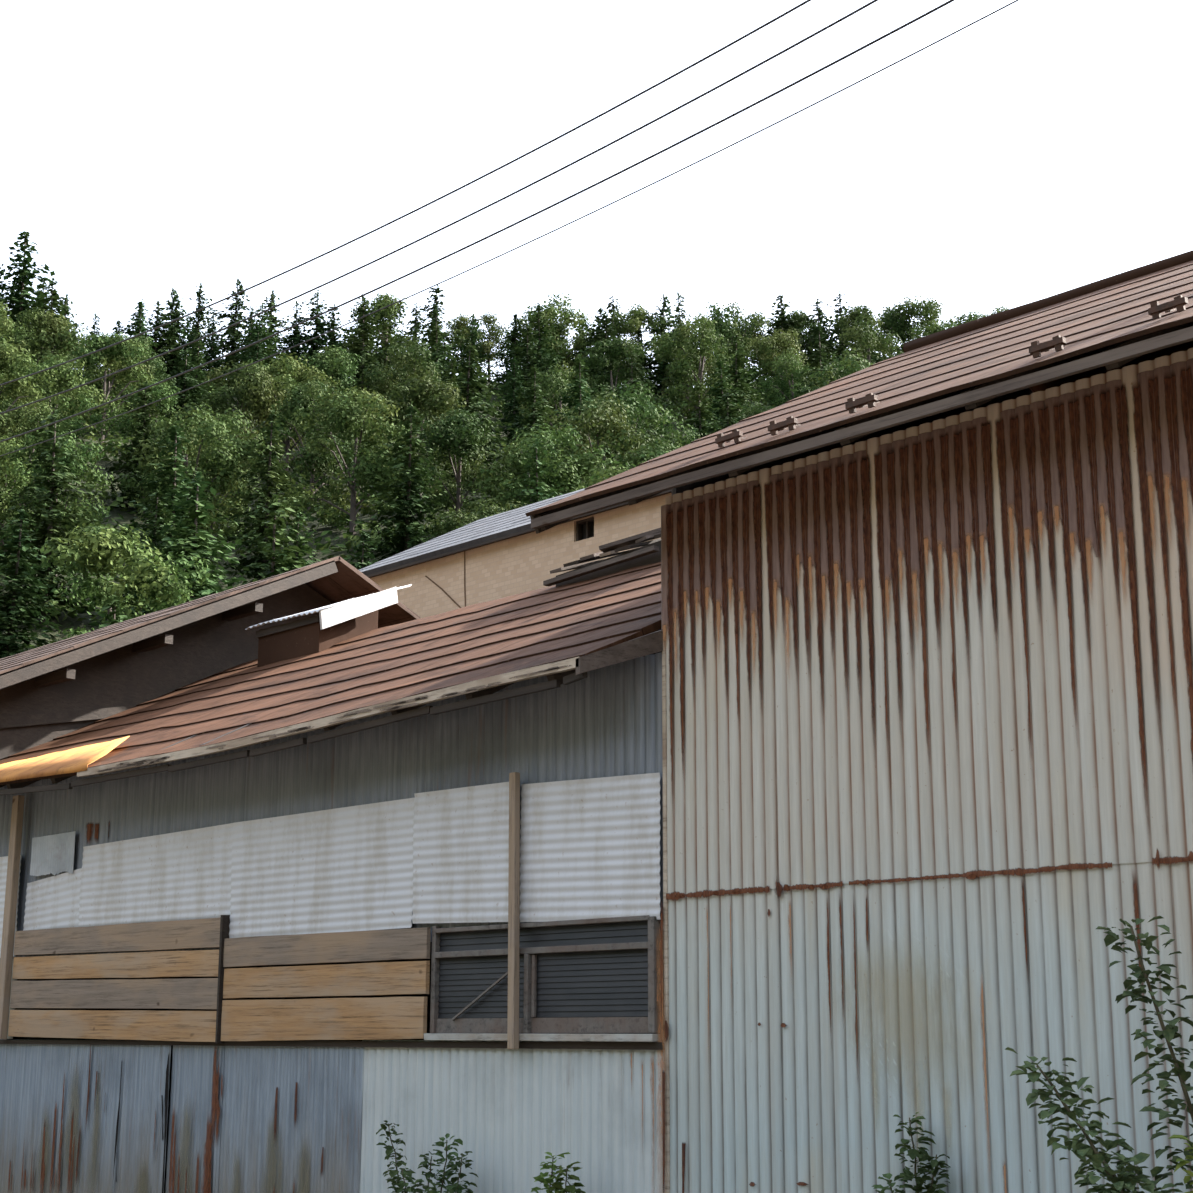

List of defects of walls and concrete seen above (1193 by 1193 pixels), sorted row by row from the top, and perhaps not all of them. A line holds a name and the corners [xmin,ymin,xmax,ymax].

corrosion [661,358,1193,799]
corrosion [1133,878,1143,985]
corrosion [1152,849,1193,868]
corrosion [631,862,1112,1193]
corrosion [8,1045,106,1193]
corrosion [169,1046,223,1193]